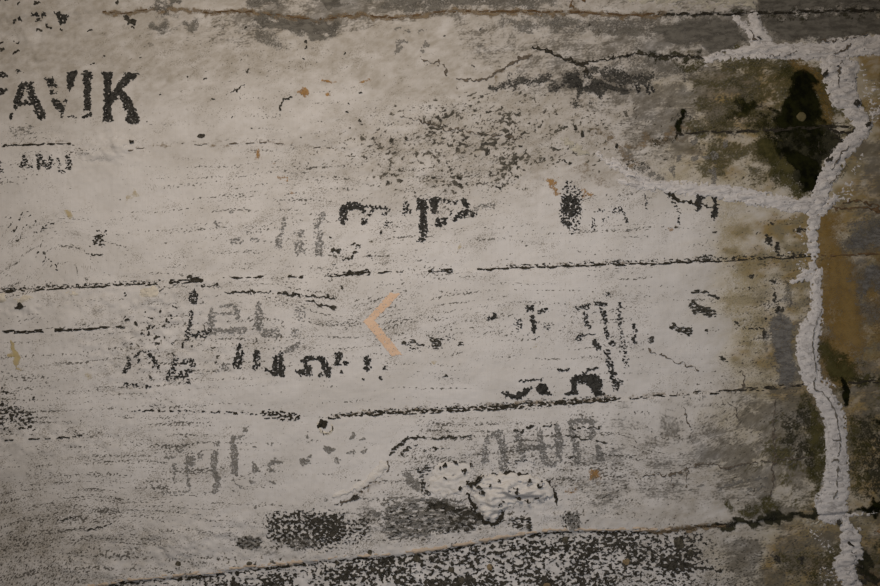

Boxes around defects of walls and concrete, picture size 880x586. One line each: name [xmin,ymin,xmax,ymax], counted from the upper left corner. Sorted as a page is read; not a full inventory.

crack [675,123,855,184]
crack [832,199,880,213]
peeling [317,419,367,463]
spalling [88,465,737,586]